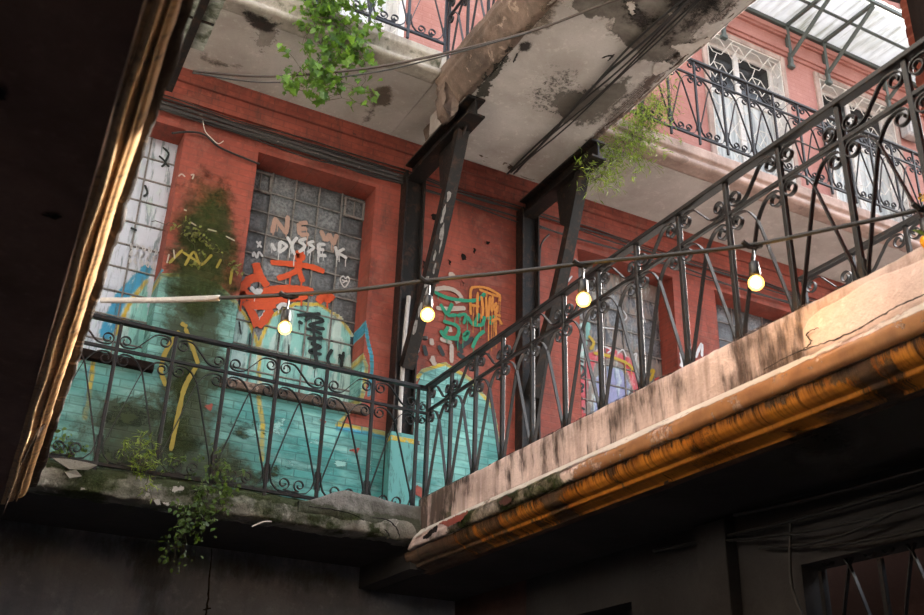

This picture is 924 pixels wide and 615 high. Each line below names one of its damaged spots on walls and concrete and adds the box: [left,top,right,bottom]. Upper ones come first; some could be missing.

leakage [242,11,281,53]
leakage [476,1,559,98]
leakage [536,0,738,142]
crack [764,294,924,370]
leakage [412,302,924,539]
crack [203,549,212,615]